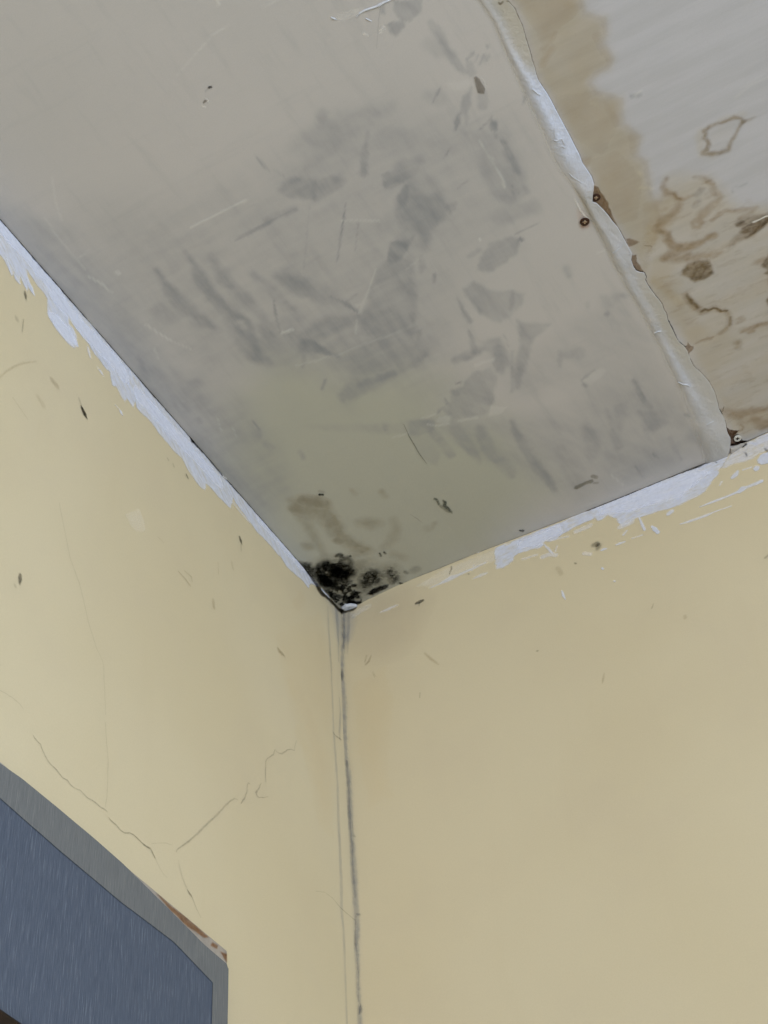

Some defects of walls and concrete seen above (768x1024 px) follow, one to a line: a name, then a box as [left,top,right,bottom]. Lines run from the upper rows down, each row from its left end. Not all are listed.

flaking render [726,427,747,455]
damp [300,554,403,606]